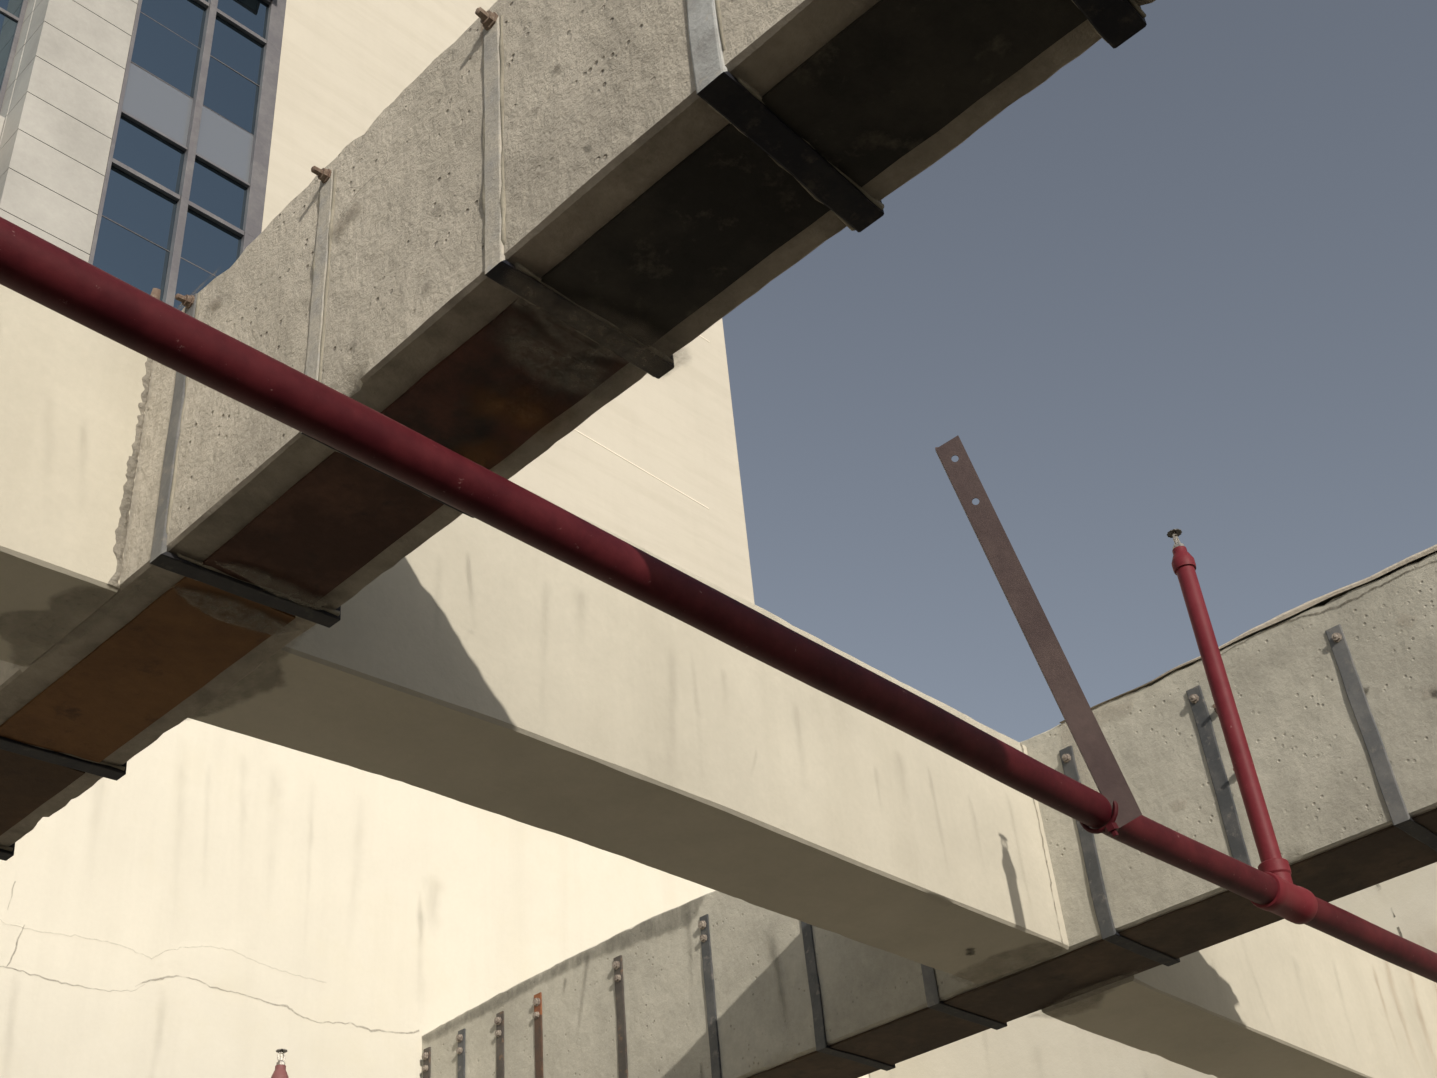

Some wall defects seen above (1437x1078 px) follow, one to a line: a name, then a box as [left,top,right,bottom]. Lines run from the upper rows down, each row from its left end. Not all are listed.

spalling [107,357,153,587]
crack [1224,561,1437,653]